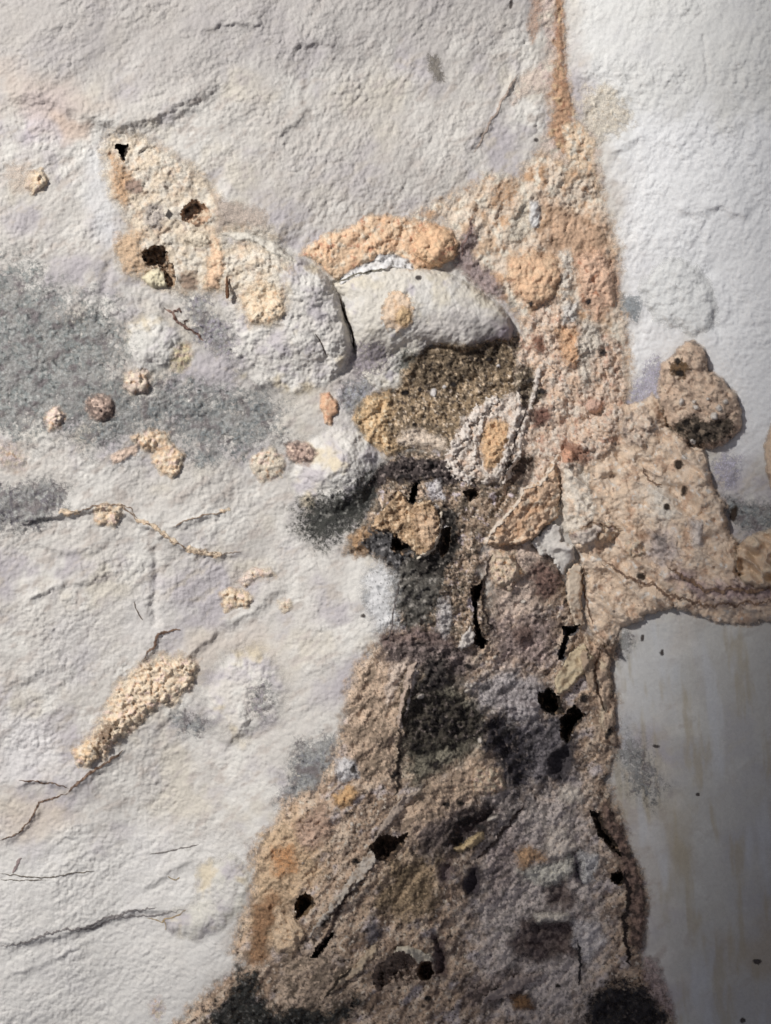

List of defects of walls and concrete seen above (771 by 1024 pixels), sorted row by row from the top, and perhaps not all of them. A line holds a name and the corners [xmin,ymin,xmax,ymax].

rust [512,0,604,192]
damp [0,247,289,468]
damp [0,477,70,534]
crack [59,503,243,558]
damp [286,469,384,554]
flaking render [173,248,675,1024]
crack [2,750,123,881]
crack [3,907,185,947]
crack [621,871,633,967]